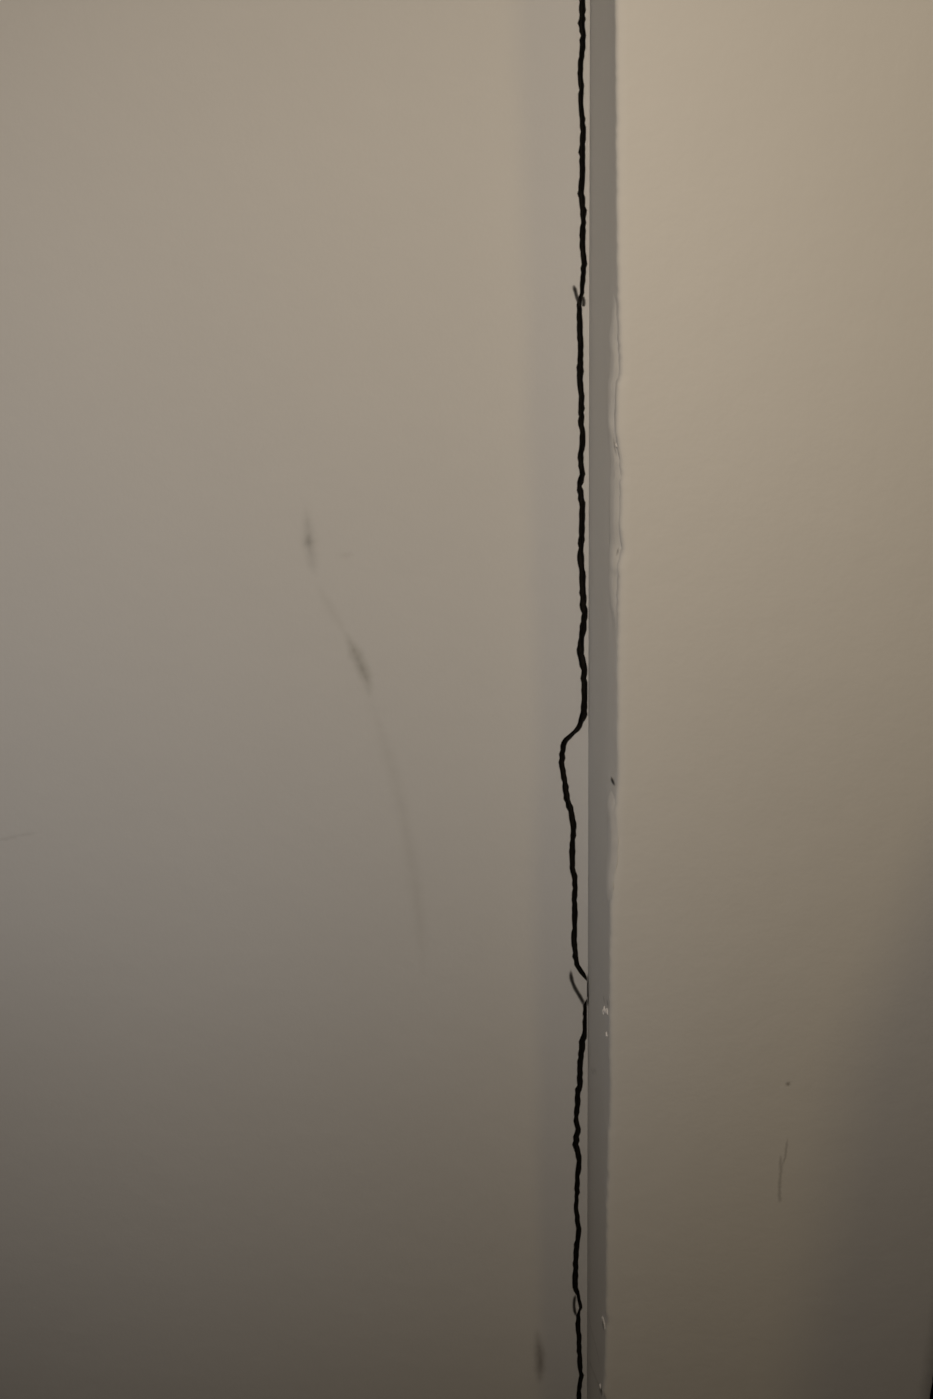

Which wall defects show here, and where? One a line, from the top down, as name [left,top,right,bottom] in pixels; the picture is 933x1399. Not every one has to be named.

crack [558,0,589,1399]